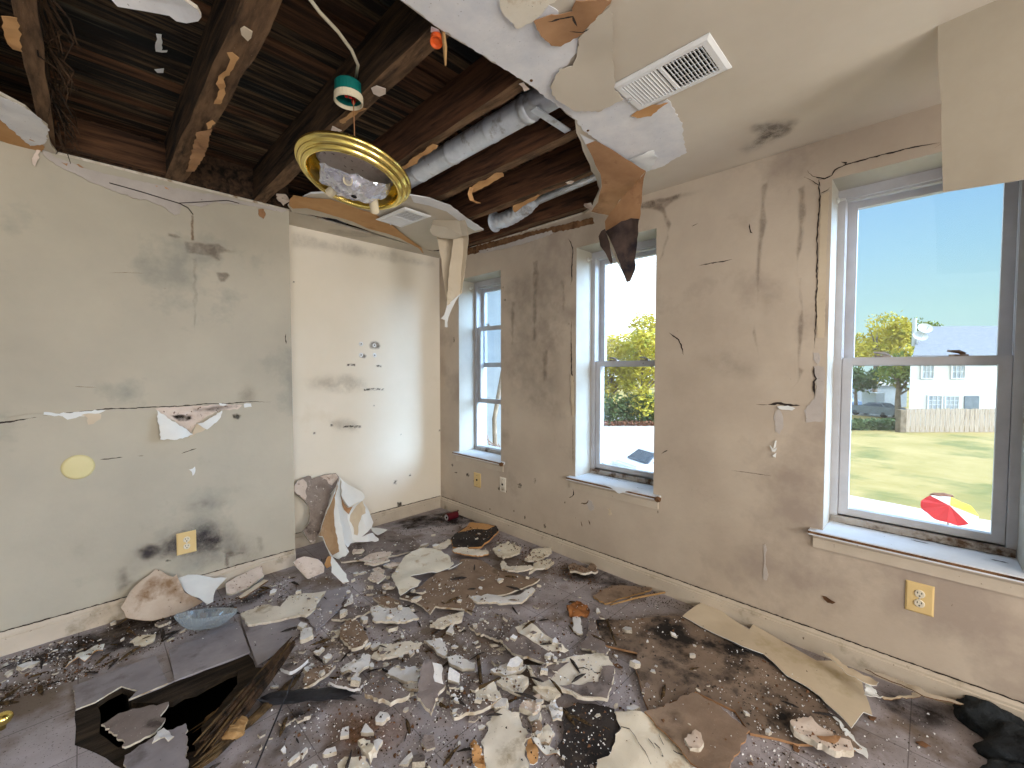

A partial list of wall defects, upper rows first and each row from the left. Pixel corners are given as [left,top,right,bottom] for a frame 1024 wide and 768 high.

flaking render [402,0,687,172]
crack [807,142,940,344]
crack [0,401,258,425]
peeling [155,404,242,440]
crack [757,402,800,410]
flaking render [804,365,825,422]
flaking render [294,479,307,500]